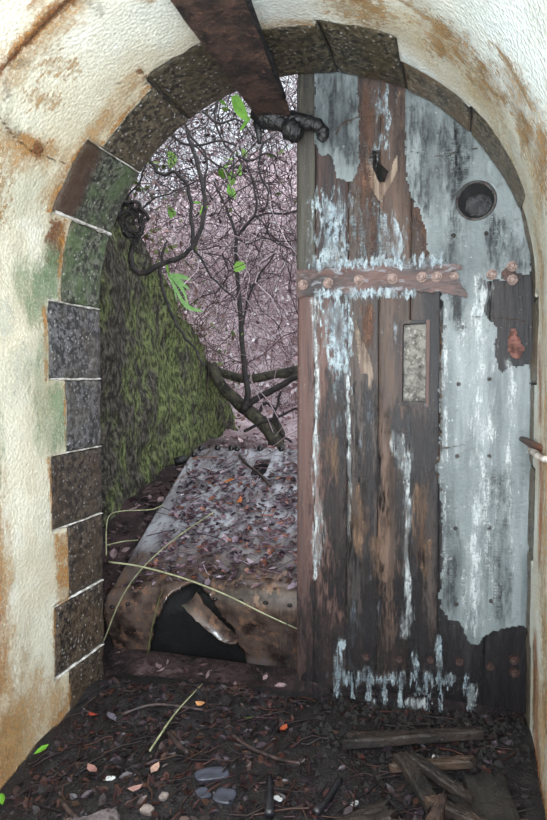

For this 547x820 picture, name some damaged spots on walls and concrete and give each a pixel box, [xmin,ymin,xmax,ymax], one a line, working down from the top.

corrosion [0,0,86,75]
peeling [321,0,547,215]
corrosion [0,131,58,169]
peeling [308,189,418,271]
peeling [414,252,443,268]
corrosion [508,329,525,359]
corrosion [53,533,69,633]
corrosion [0,645,71,789]